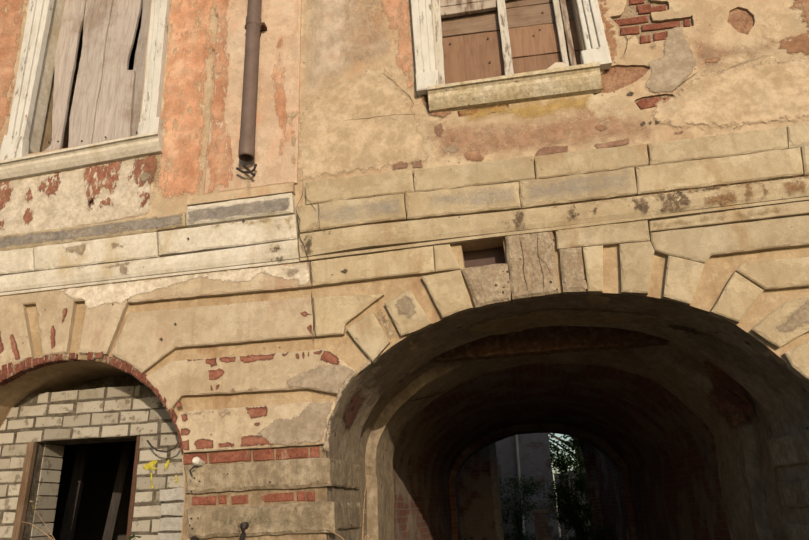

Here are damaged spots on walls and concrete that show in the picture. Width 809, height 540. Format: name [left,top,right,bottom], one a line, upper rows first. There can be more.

peeling [0,0,27,137]
flaking render [593,0,809,134]
peeling [84,0,233,210]
flaking render [0,181,13,210]
flaking render [23,172,61,225]
damp [633,198,649,213]
damp [657,190,690,212]
flaking render [60,262,309,309]
crack [519,237,549,294]
flaking render [0,308,339,465]
flaking render [192,495,248,505]
flaking render [261,491,315,502]